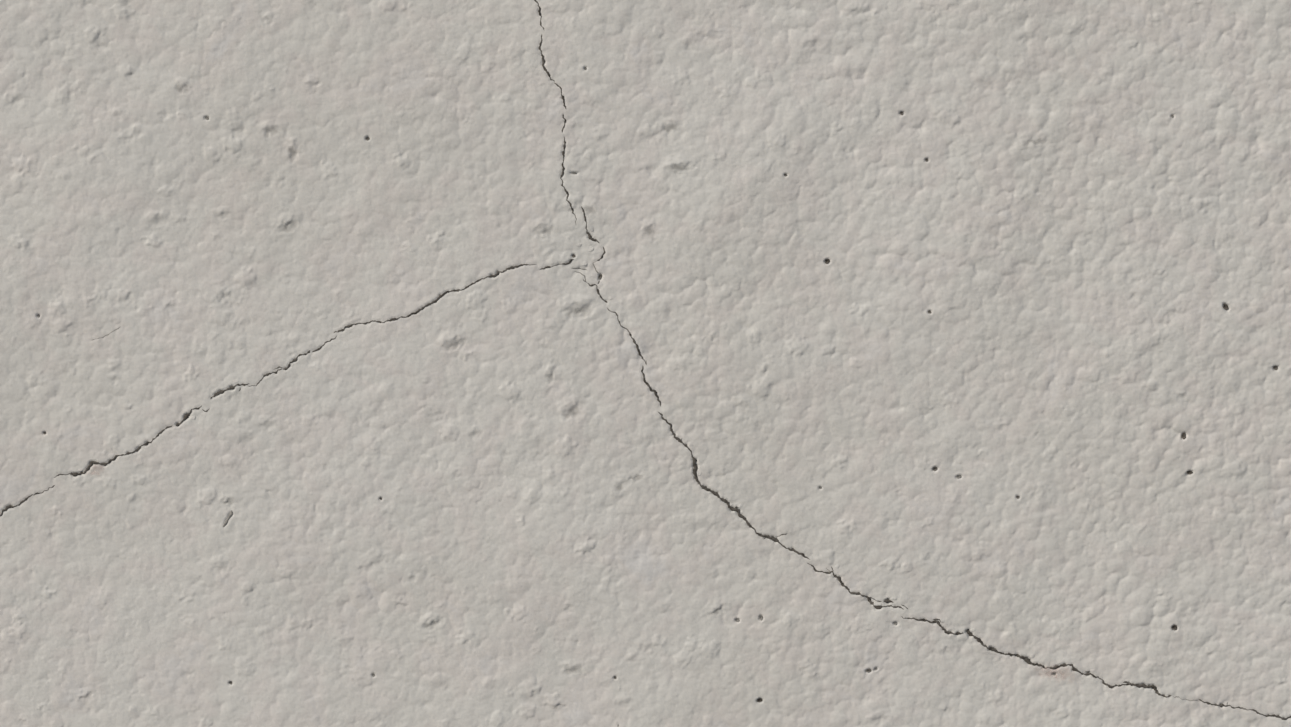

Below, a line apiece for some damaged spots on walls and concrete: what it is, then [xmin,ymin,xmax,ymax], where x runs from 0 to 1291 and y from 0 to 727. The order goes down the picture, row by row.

crack [211,0,908,609]
crack [0,406,209,516]
crack [902,617,1291,720]